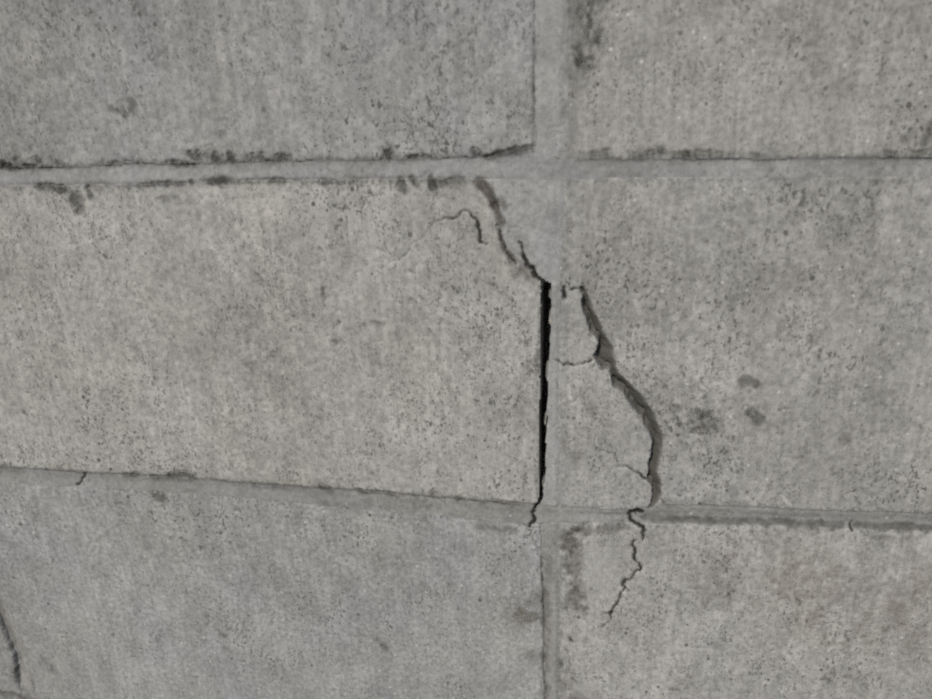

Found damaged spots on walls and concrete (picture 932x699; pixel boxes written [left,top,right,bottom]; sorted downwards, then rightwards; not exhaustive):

crack [451,211,665,627]